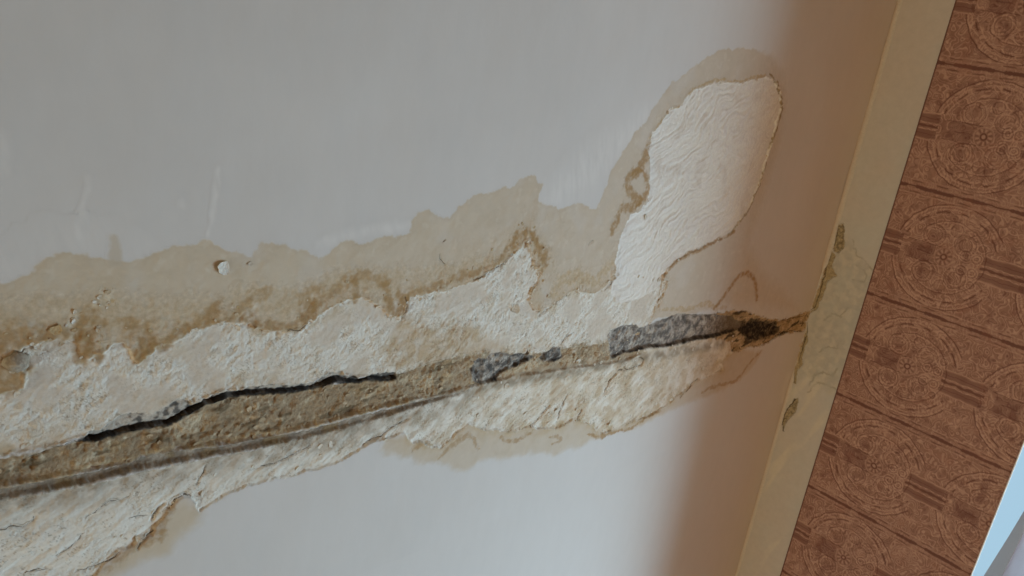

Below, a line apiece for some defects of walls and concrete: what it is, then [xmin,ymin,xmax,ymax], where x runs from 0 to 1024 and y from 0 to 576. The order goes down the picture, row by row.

water stain [0,46,879,475]
flaking render [810,222,846,314]
crack [287,321,310,332]
flaking render [0,72,784,576]
crack [24,370,398,459]
crack [362,418,407,445]
crack [604,357,644,390]
flaking render [781,328,809,432]